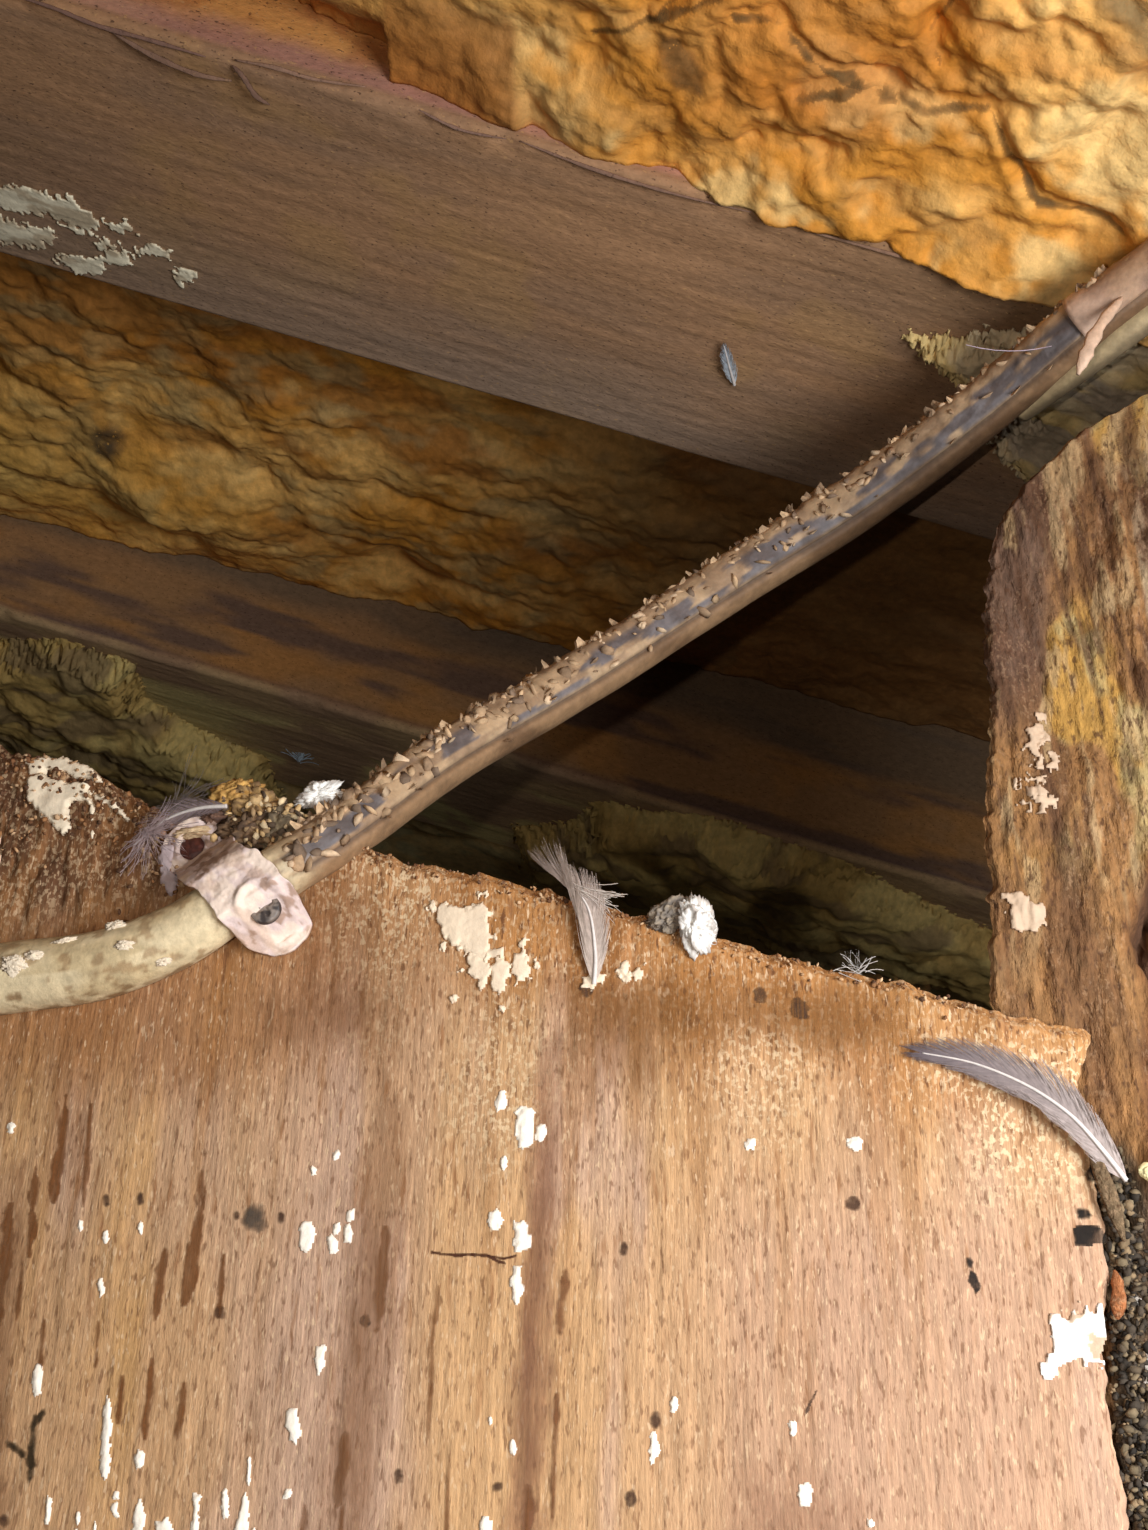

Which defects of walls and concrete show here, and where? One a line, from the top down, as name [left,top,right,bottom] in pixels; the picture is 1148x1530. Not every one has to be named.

peeling [0,183,198,288]
peeling [25,756,130,839]
peeling [1012,712,1060,815]
peeling [425,890,540,1013]
peeling [1001,891,1047,933]
water stain [755,988,767,1003]
water stain [790,997,809,1019]
water stain [846,1197,861,1210]
crack [431,1251,516,1264]
peeling [1040,1300,1107,1380]
peeling [99,1395,202,1530]
water stain [626,1492,636,1506]